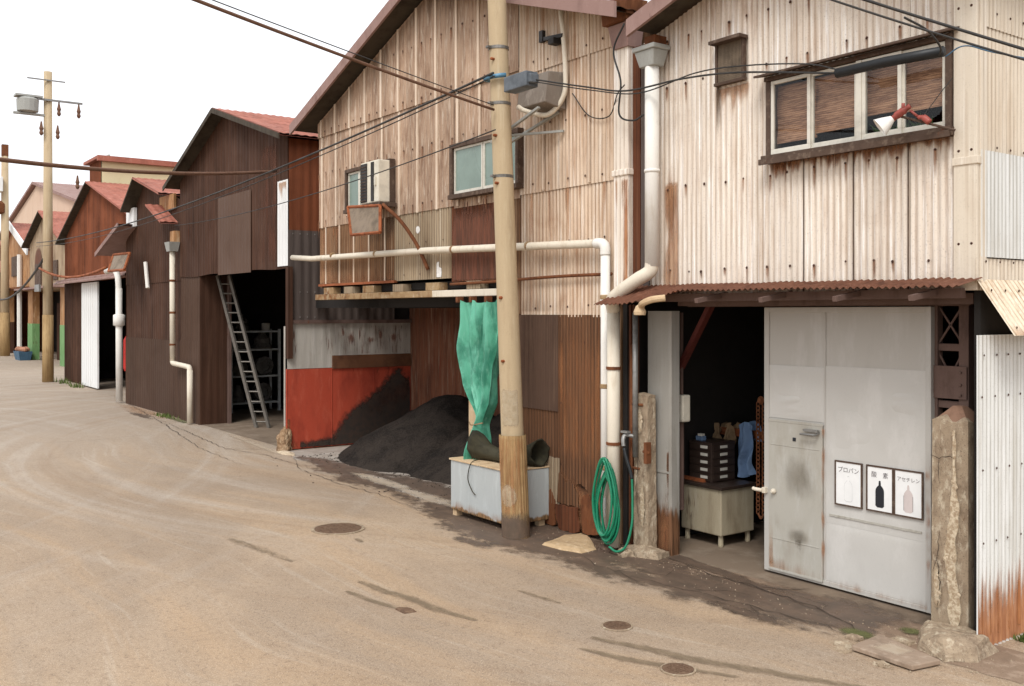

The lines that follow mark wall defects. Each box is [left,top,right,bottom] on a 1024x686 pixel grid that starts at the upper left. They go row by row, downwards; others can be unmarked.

rust [665,184,687,293]
rust [545,472,599,535]
rust [978,576,1024,645]